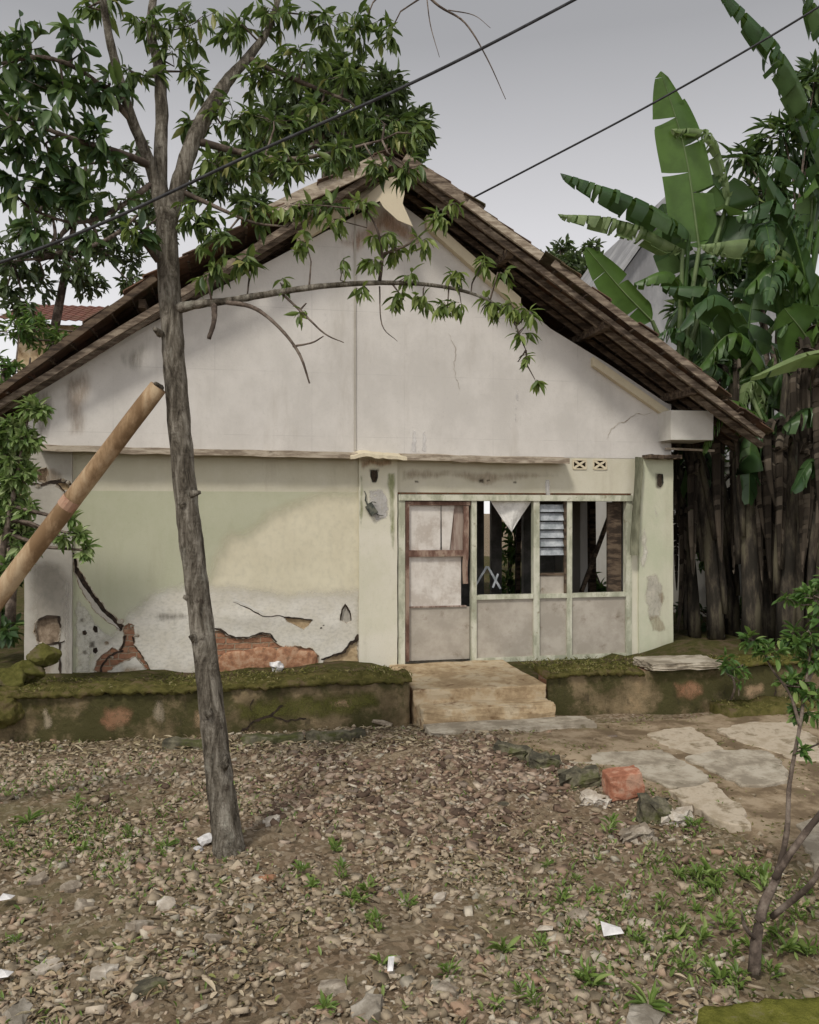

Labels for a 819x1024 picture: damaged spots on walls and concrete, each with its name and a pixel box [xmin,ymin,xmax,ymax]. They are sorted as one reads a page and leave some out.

peeling [641,535,662,617]
flaking render [76,602,112,673]
spalling [215,628,359,672]
peeling [283,616,313,630]
peeling [340,604,352,624]
crack [241,699,306,732]